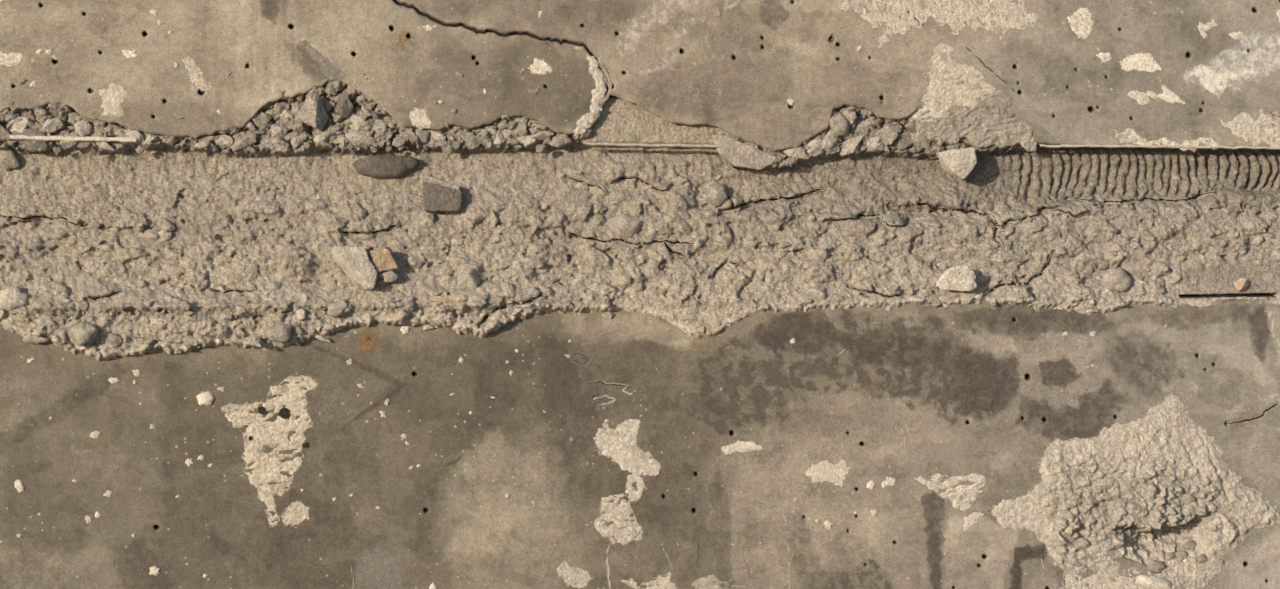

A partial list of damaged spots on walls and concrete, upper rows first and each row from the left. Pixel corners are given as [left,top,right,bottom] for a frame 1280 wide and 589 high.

crack [388,0,613,128]
peeling [98,82,130,117]
peeling [409,107,432,130]
damp [699,311,1122,439]
damp [1115,339,1170,389]
crack [1227,400,1280,426]
peeling [220,375,318,528]
peeling [593,419,661,476]
peeling [586,493,643,545]
damp [921,493,943,589]
damp [1010,544,1046,589]
spalling [914,393,1280,589]